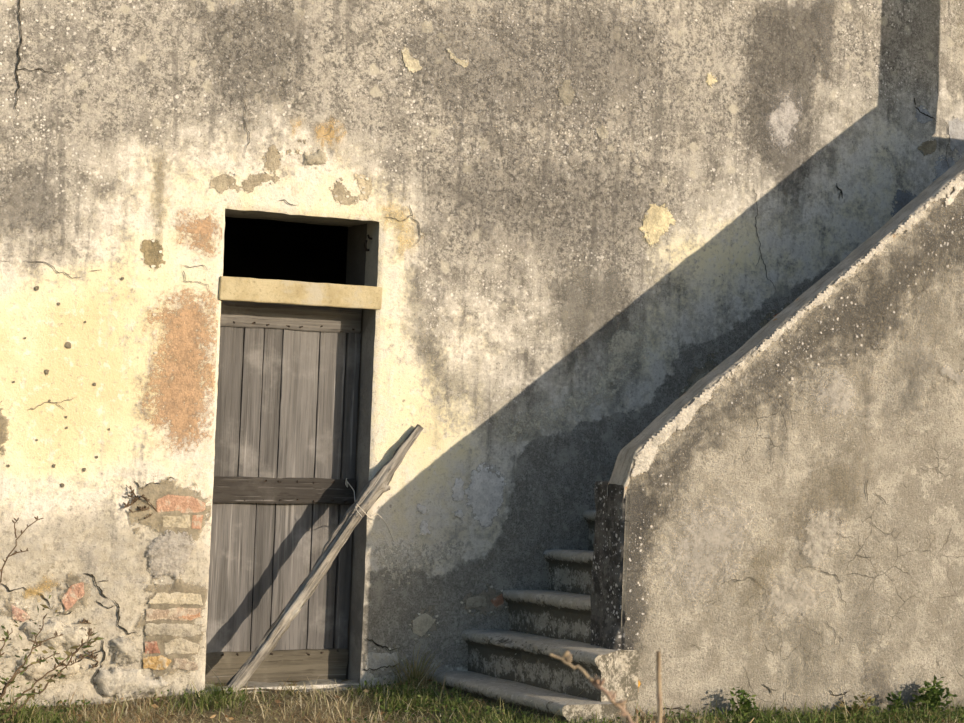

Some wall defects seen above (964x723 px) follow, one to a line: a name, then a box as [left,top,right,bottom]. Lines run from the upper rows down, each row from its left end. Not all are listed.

crack [15,0,55,125]
leakage [397,5,670,135]
flaking render [209,138,309,194]
leakage [769,95,802,147]
flaking render [140,240,165,271]
crack [754,190,776,289]
flaking render [631,116,964,477]
spalling [127,476,211,540]
crack [3,584,74,622]
crack [84,573,139,695]
spalling [136,577,207,682]
crack [799,545,846,603]